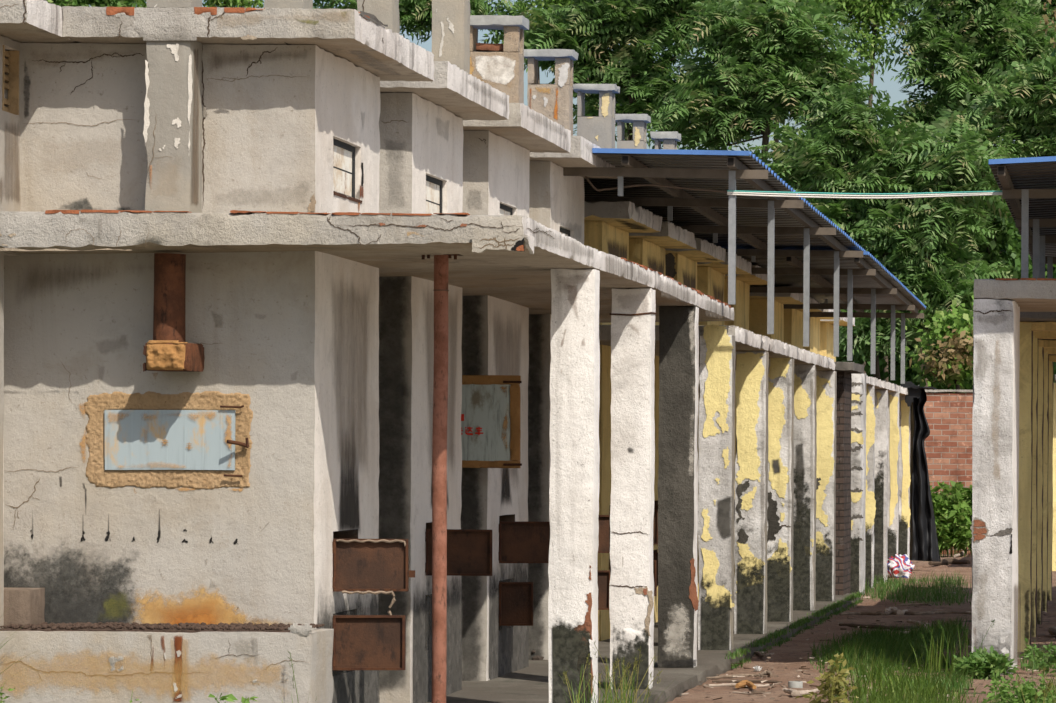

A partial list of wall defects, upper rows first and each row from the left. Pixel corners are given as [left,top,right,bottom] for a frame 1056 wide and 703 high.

peeling [159,43,207,151]
crack [194,12,303,209]
crack [327,216,555,247]
crack [5,467,78,524]
damp [378,276,408,539]
peeling [689,324,834,611]
peeling [851,385,911,530]
corrosion [137,588,245,702]
damp [378,591,407,615]
spalling [575,593,594,696]
damp [613,627,649,689]
damp [662,444,832,667]